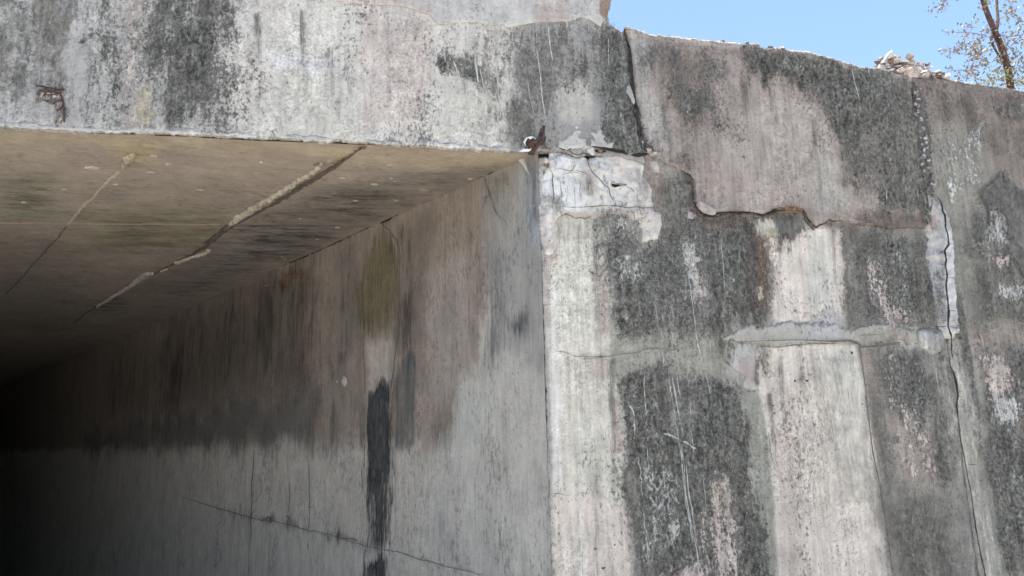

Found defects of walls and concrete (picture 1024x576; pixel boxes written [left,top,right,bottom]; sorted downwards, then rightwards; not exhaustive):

spalling [0,85,202,136]
spalling [218,132,270,140]
crack [268,214,399,273]
peeling [417,125,662,256]
crack [550,29,657,219]
crack [681,170,919,236]
water stain [741,44,940,330]
water stain [578,154,803,576]
crack [937,196,986,576]
crack [184,457,479,575]
water stain [361,357,414,576]